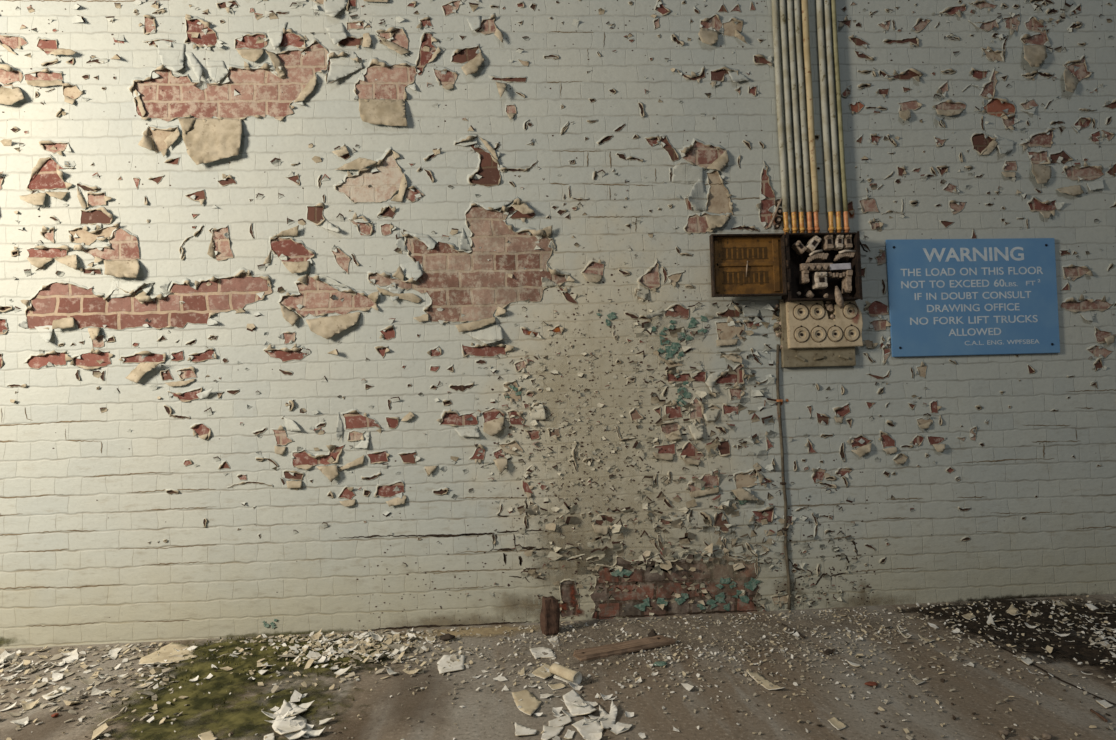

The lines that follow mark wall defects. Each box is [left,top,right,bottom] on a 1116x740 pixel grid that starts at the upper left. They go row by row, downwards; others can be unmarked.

peeling [0,0,592,190]
peeling [595,0,774,98]
peeling [838,0,1116,240]
peeling [0,118,989,621]
peeling [1059,236,1116,389]